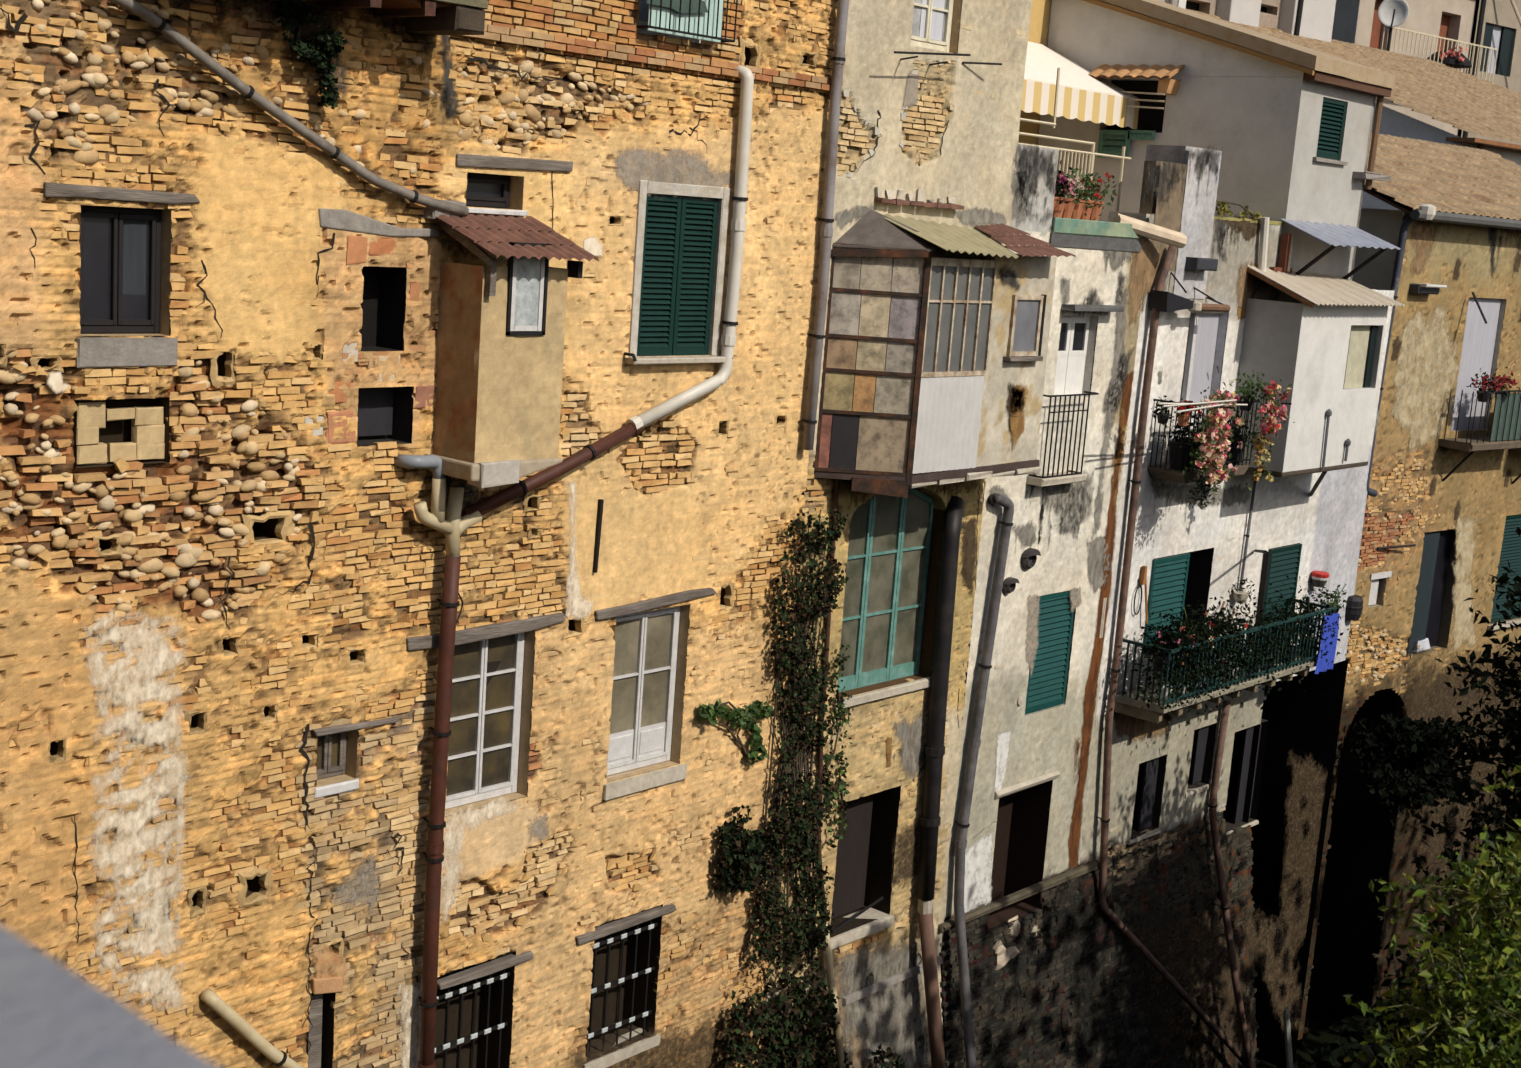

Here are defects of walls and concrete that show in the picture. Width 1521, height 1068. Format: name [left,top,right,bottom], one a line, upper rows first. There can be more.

peeling [837,89,880,178]
peeling [899,58,957,165]
spalling [617,415,698,493]
water stain [919,237,1168,611]
rust [1068,372,1134,868]
efflorescence [88,614,186,1009]
crack [299,724,318,1051]